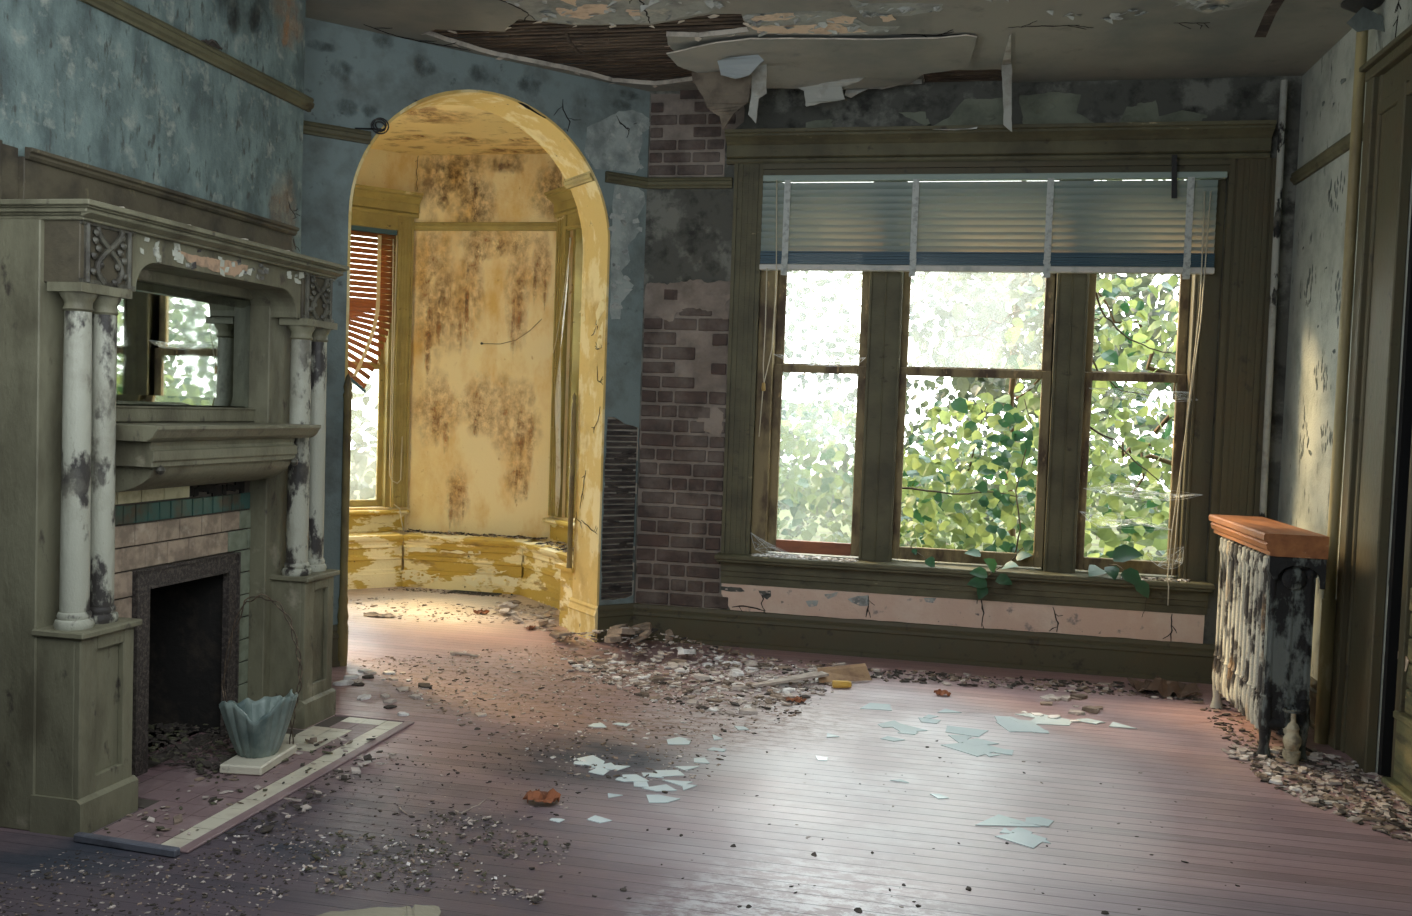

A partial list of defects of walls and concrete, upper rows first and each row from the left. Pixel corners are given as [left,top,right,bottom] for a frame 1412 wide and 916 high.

crack [901,29,971,37]
damp [423,139,487,221]
flaking render [580,85,771,609]
peeling [400,546,518,588]